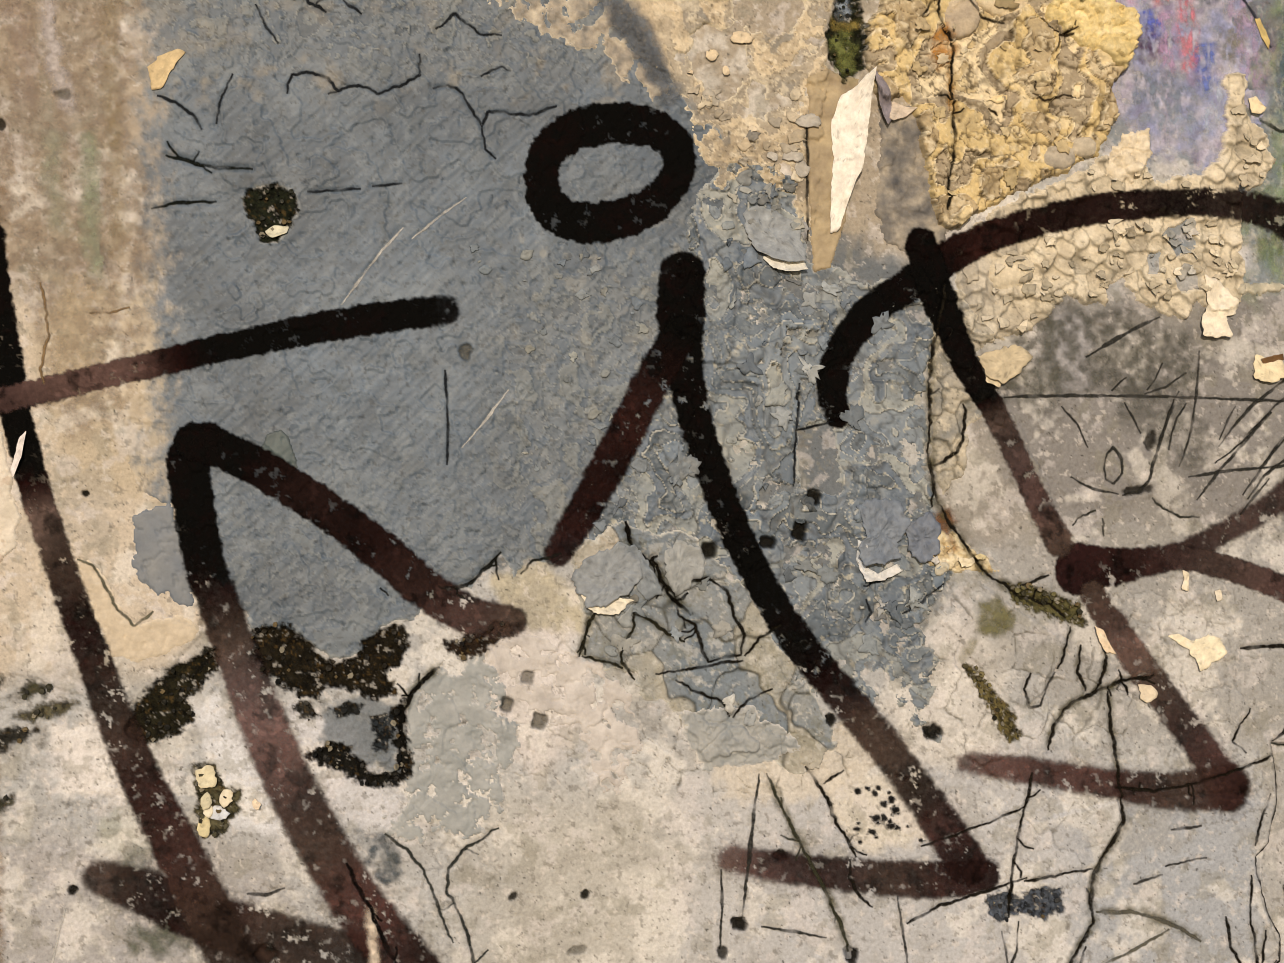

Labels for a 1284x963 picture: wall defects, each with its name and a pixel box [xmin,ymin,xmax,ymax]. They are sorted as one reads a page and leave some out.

crack [151,73,253,209]
crack [255,4,279,43]
crack [306,0,362,14]
crack [307,183,402,193]
crack [286,12,557,159]
peeling [443,0,1284,795]
crack [577,521,782,718]
crack [863,578,944,623]
crack [906,284,1284,963]
crack [766,766,873,952]